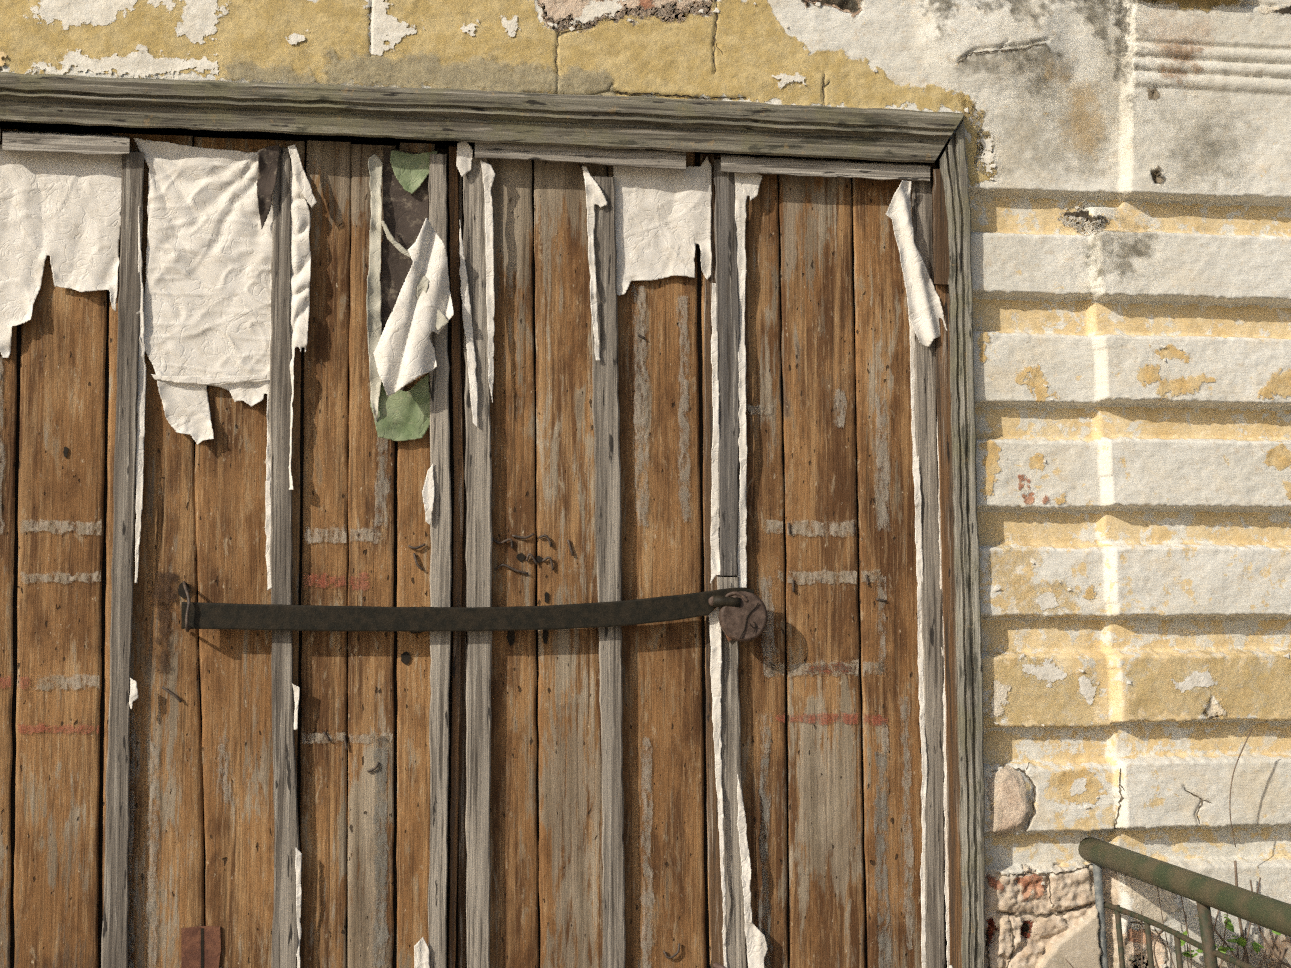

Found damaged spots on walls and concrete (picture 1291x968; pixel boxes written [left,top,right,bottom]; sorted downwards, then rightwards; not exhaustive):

damp [978,0,1055,27]
damp [1074,0,1131,101]
peeling [0,0,997,187]
peeling [1137,344,1216,401]
peeling [1257,368,1291,400]
peeling [1047,762,1107,809]
spalling [986,874,1045,902]
spalling [985,918,999,948]
spalling [1021,920,1034,938]